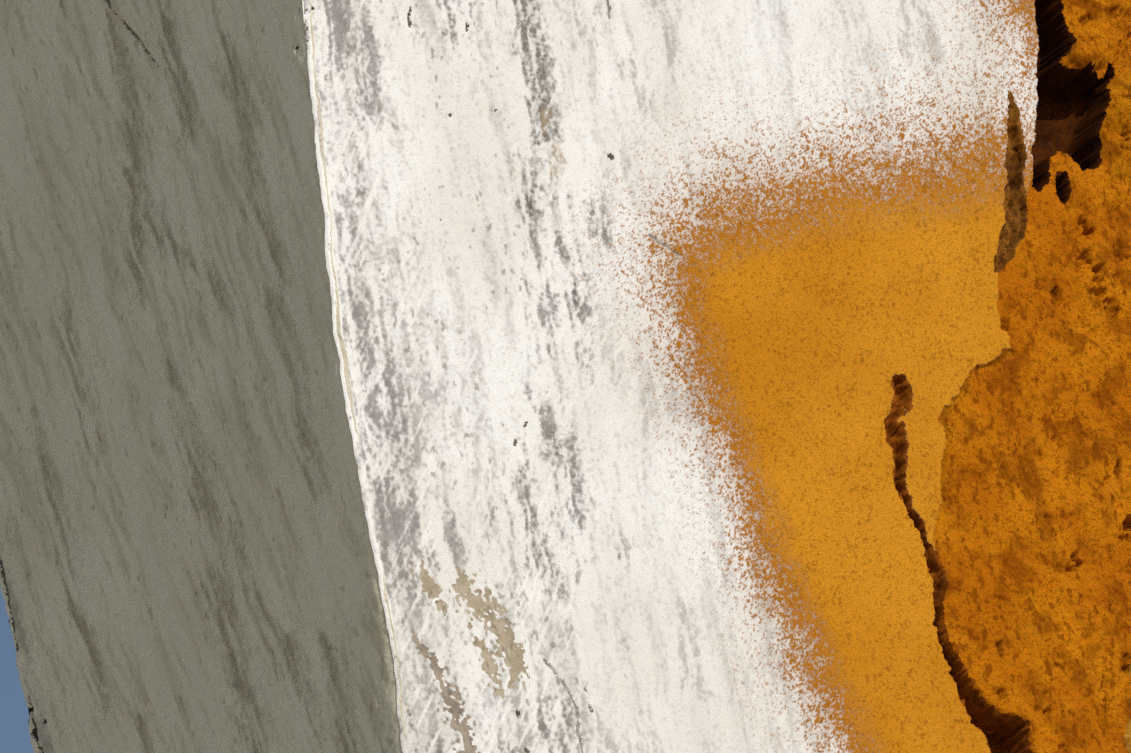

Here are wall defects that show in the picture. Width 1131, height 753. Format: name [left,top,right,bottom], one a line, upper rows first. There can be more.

spalling [933,0,1131,753]
crack [884,348,1033,753]
peeling [411,632,480,753]
peeling [410,560,530,699]
crack [543,658,594,753]